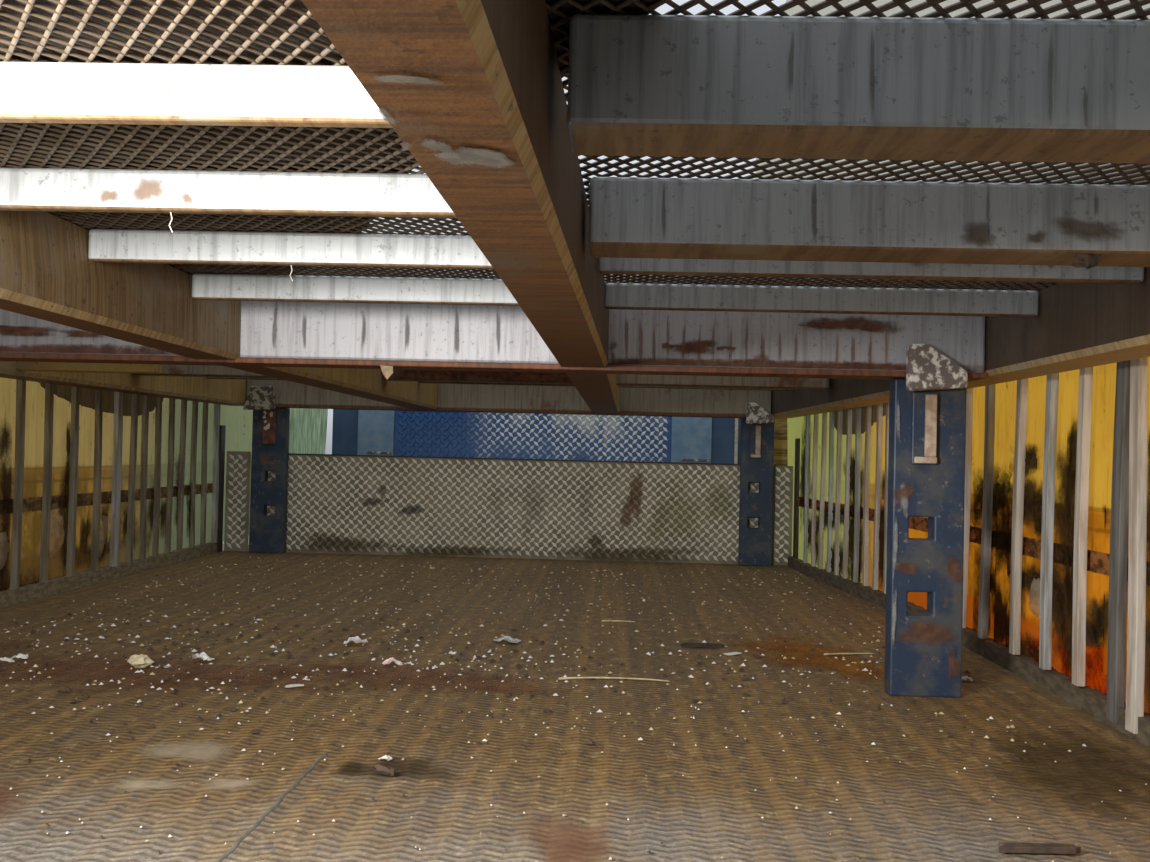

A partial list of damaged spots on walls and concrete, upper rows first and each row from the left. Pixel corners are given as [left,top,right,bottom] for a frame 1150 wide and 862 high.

peeling [372,75,439,84]
peeling [400,139,512,167]
corrosion [0,326,170,354]
corrosion [611,317,906,370]
corrosion [395,370,568,385]
corrosion [901,623,960,676]